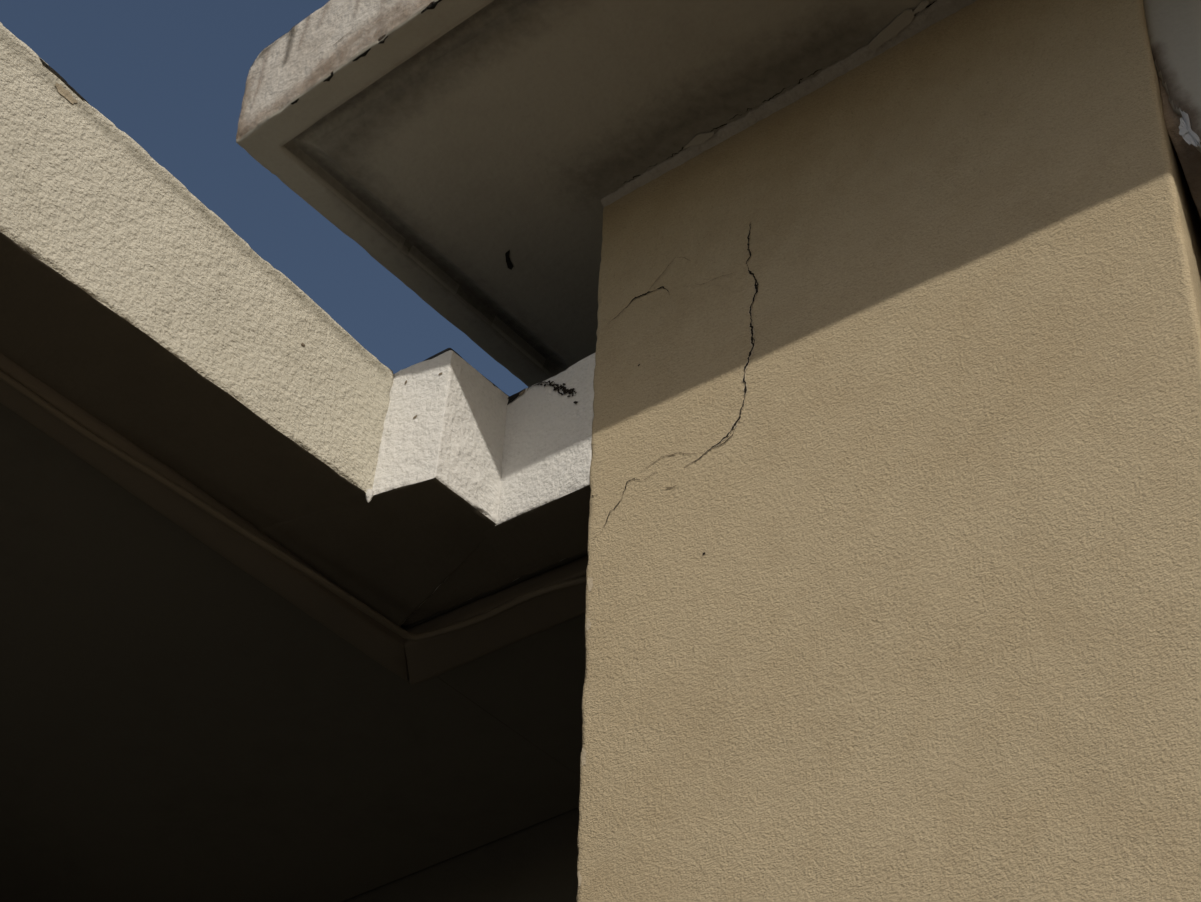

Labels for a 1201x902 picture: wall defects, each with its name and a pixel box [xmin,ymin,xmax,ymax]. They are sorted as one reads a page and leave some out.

flaking render [1179,109,1201,148]
crack [592,222,759,534]